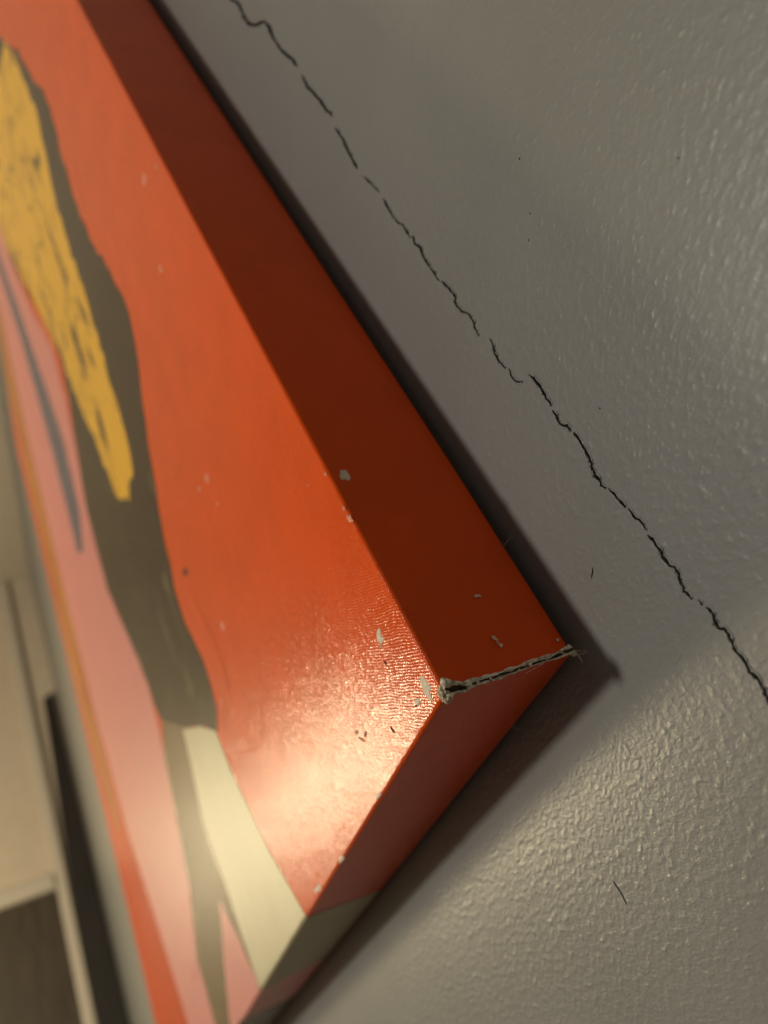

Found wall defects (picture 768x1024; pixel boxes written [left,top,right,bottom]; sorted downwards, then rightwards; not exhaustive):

crack [229,0,768,706]